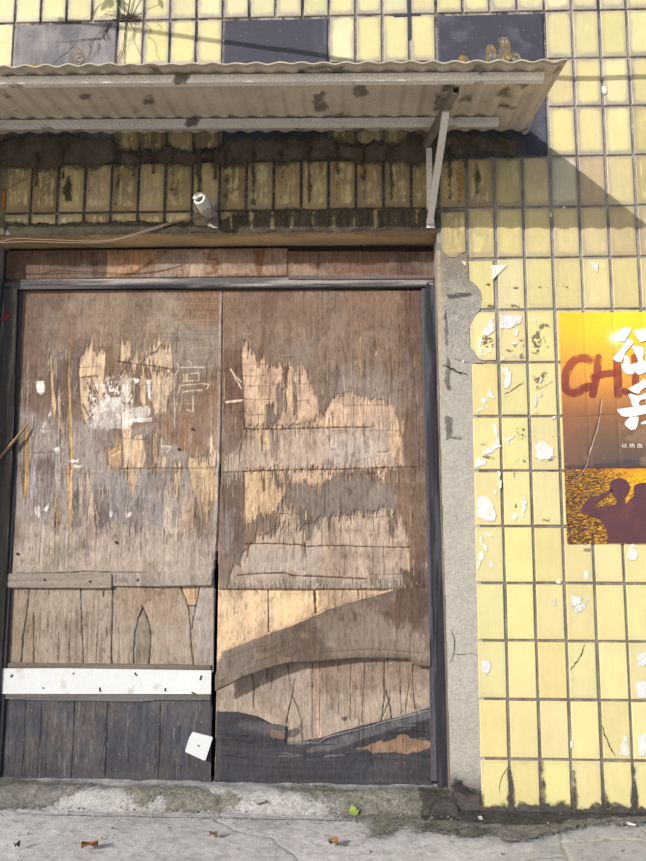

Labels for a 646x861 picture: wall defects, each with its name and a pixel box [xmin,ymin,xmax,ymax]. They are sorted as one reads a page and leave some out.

leakage [0,130,523,238]
spalling [440,250,491,363]
leakage [451,762,646,816]